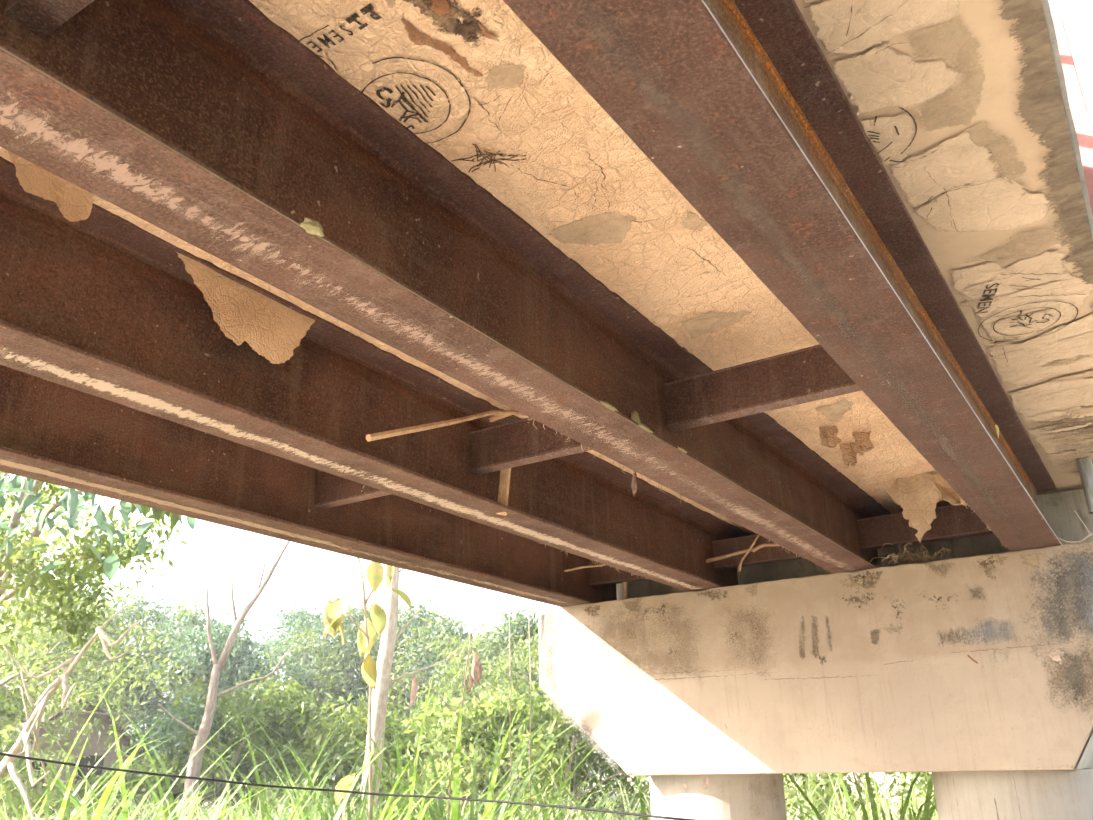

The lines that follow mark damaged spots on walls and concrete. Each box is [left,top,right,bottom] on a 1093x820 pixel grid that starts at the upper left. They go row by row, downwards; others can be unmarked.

spalling [386,0,499,48]
peeling [486,64,526,91]
water stain [1000,0,1093,284]
corrosion [722,0,1031,483]
peeling [0,89,858,605]
water stain [1036,405,1093,462]
water stain [799,616,832,658]
water stain [939,620,1017,645]
water stain [1032,552,1093,707]